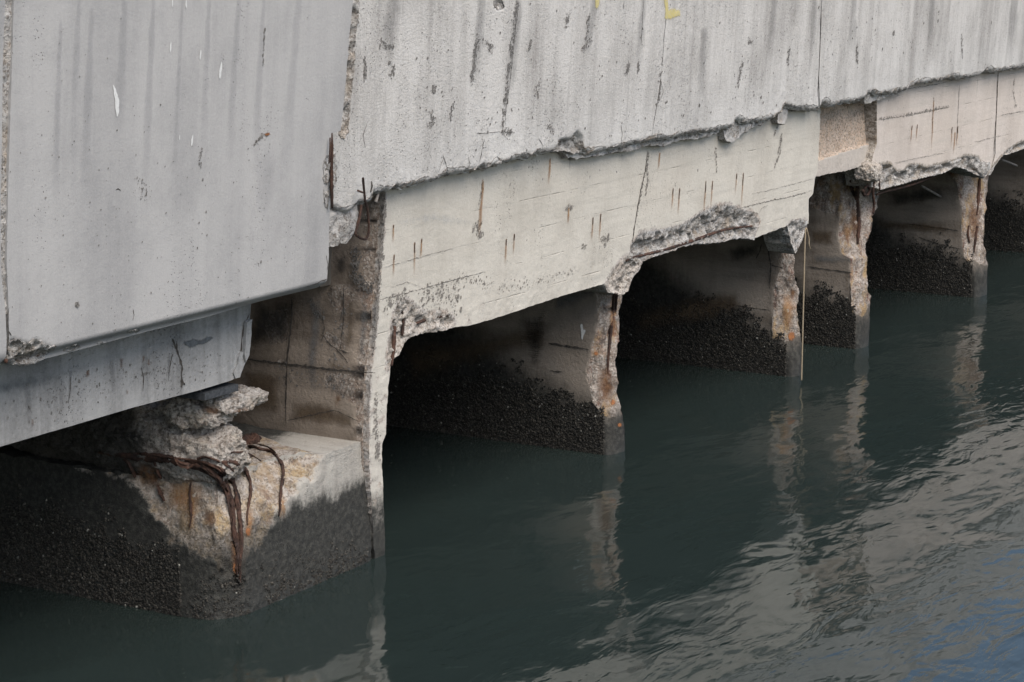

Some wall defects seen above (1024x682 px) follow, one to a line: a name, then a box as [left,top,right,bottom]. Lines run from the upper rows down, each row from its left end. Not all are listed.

spalling [322,0,1024,252]
spalling [0,338,80,366]
spalling [387,299,455,370]
corrosion [601,372,615,405]
spalling [592,205,807,374]
spalling [98,443,285,582]